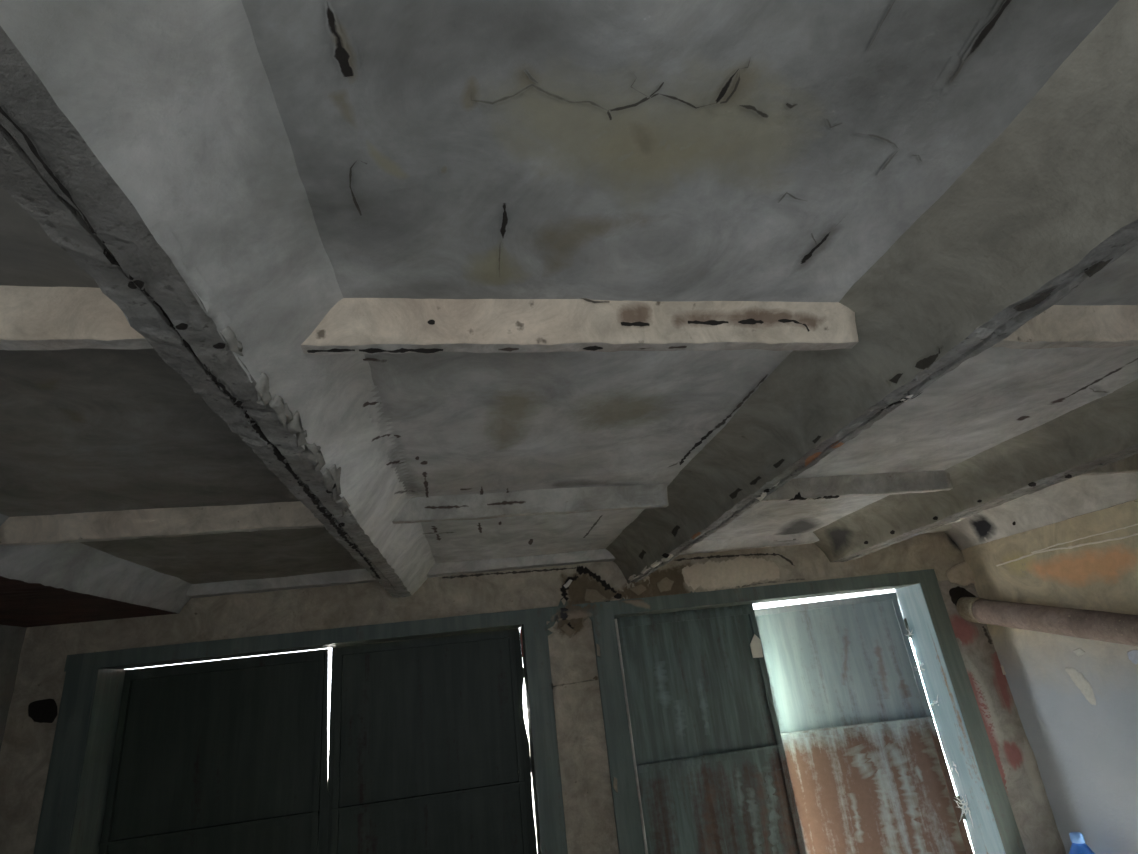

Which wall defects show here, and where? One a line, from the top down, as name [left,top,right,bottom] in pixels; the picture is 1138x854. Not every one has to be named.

crack [456,54,798,160]
crack [826,118,924,175]
crack [0,106,381,579]
spalling [145,219,350,517]
crack [476,203,518,292]
crack [785,213,849,280]
spalling [887,346,944,385]
spalling [1011,287,1058,312]
spalling [1083,256,1116,278]
spalling [544,552,807,647]